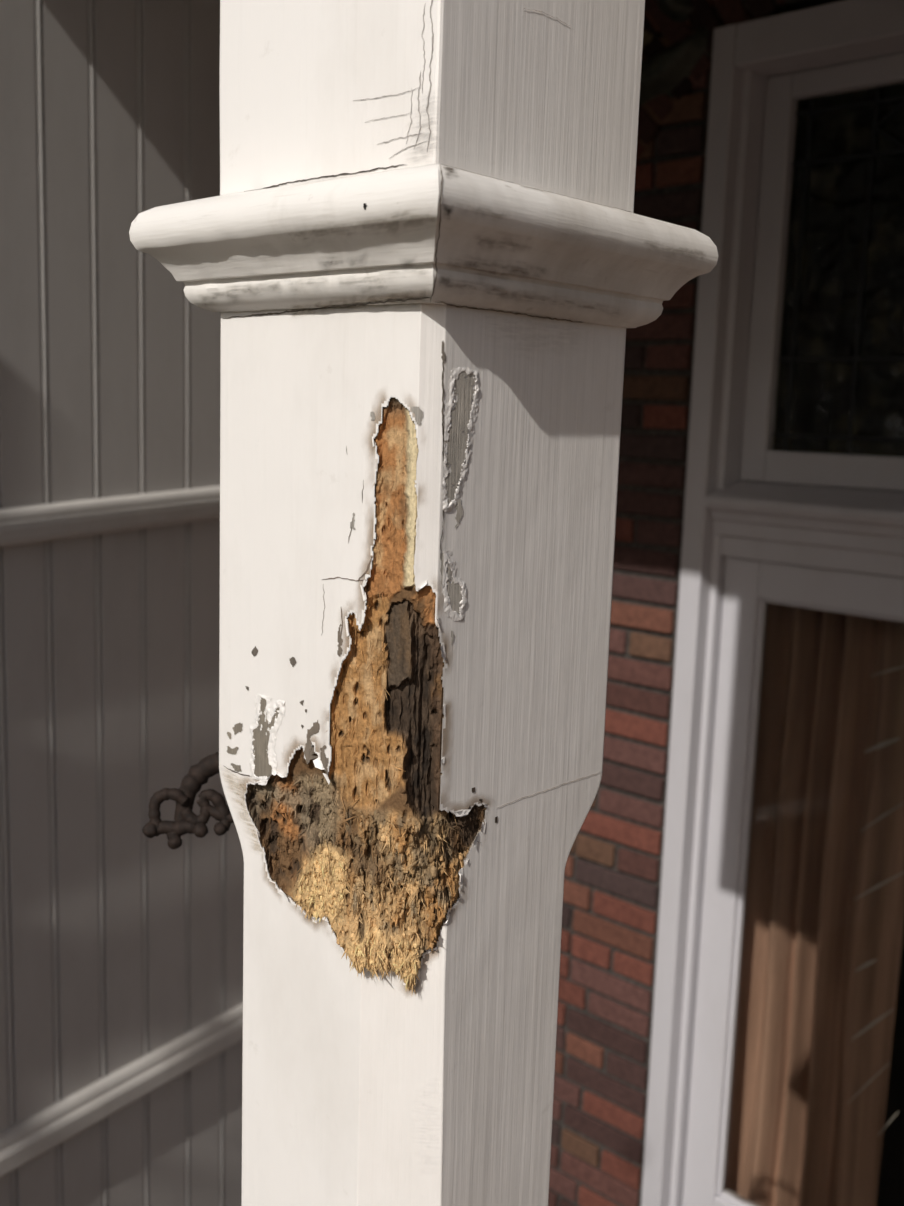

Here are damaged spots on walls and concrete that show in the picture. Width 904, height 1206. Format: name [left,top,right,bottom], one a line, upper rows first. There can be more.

peeling [411,407,423,425]
peeling [441,342,480,528]
peeling [337,580,367,657]
spalling [386,550,482,820]
peeling [227,686,330,785]
peeling [458,816,498,891]